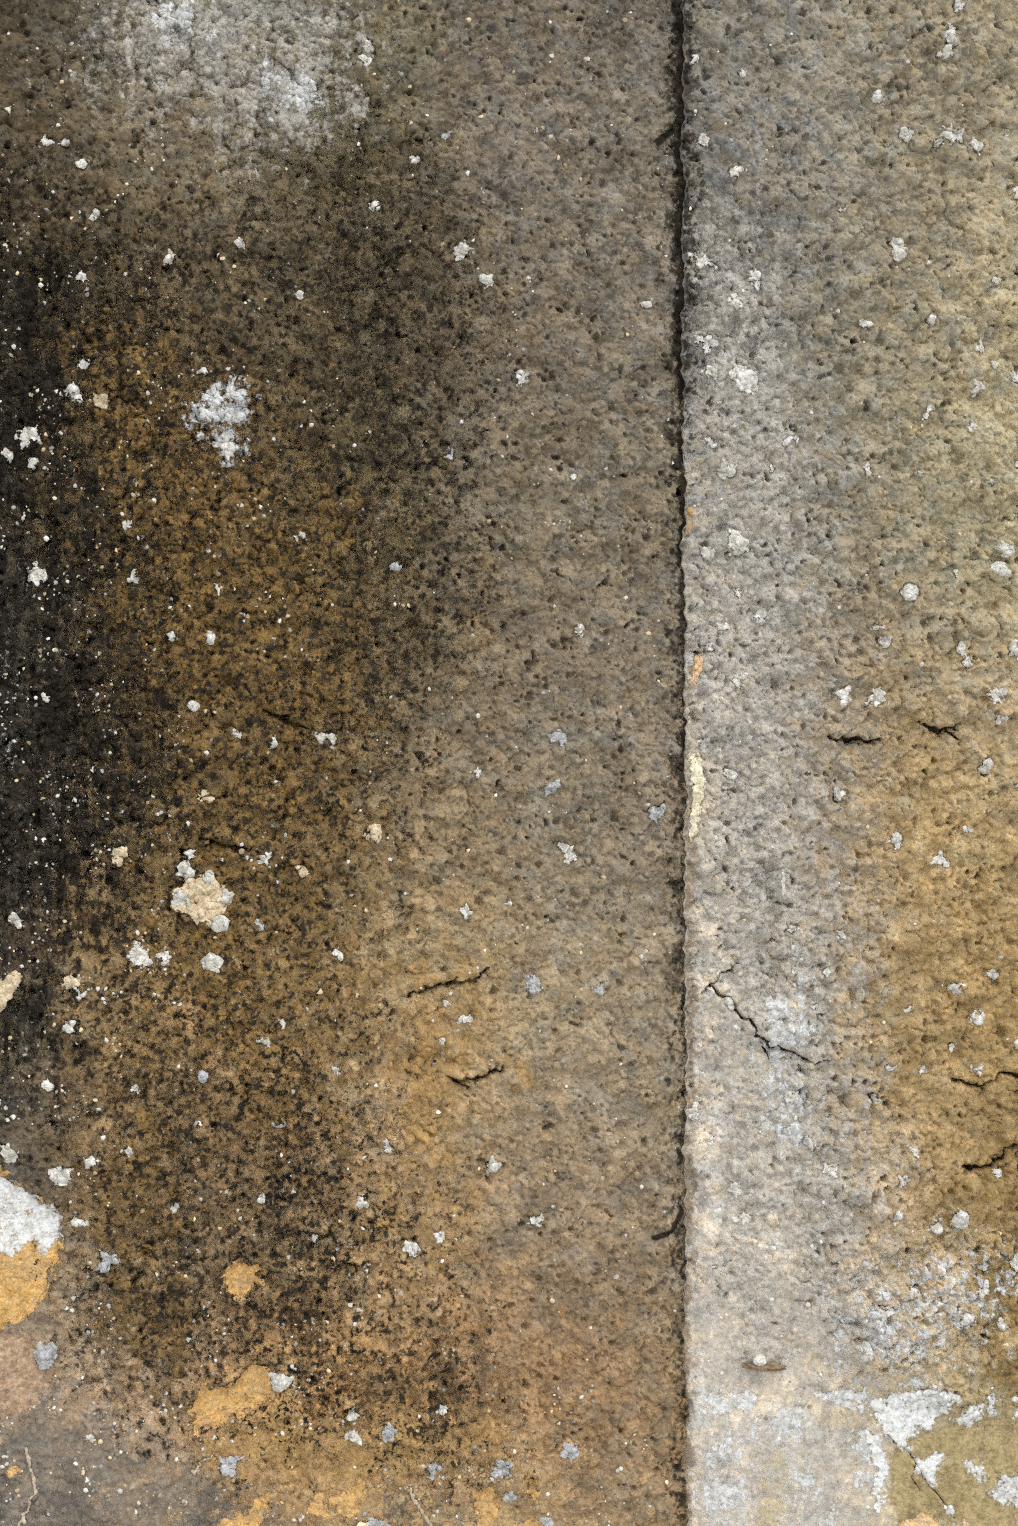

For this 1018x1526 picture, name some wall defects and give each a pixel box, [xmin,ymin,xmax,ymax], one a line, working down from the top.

damp [0,0,550,1505]
crack [651,0,829,1525]
peeling [96,1250,121,1273]
peeling [7,1465,22,1478]
peeling [814,1383,1018,1526]